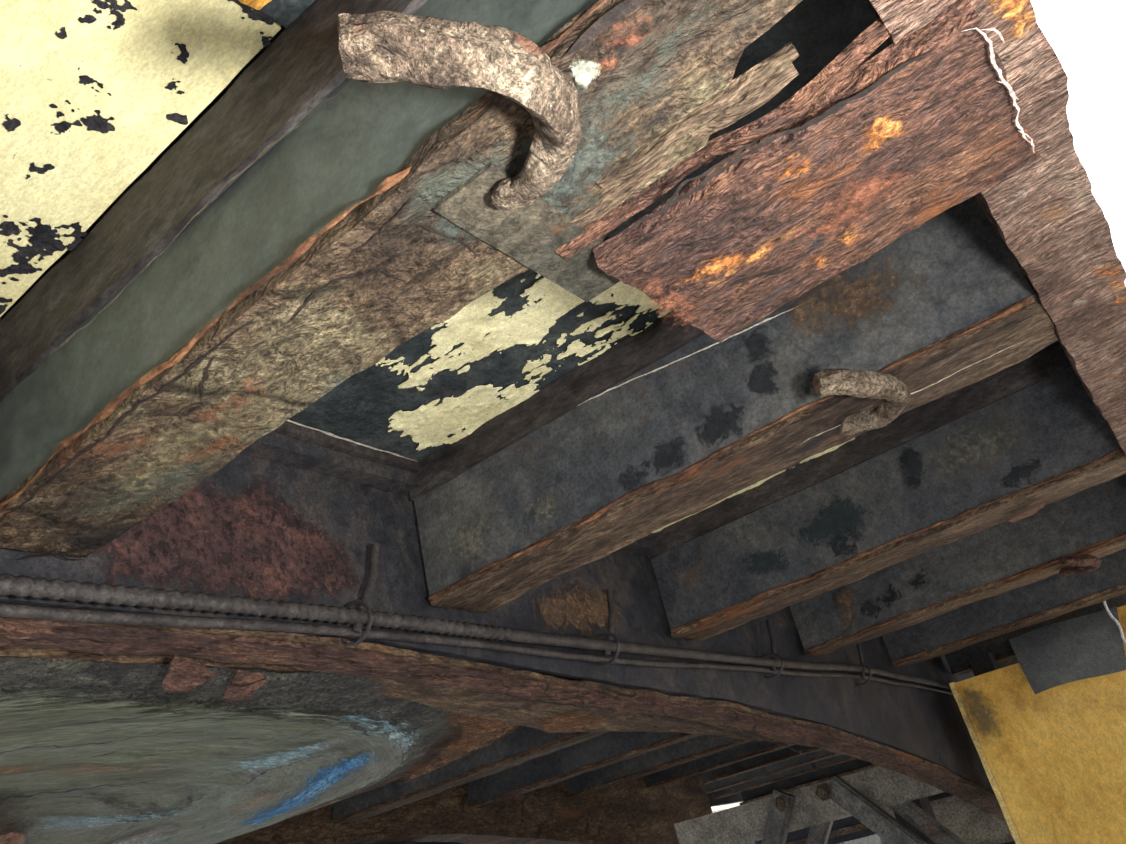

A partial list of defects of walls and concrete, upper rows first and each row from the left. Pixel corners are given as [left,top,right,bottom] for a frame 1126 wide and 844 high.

peeling [78,0,137,30]
corrosion [964,0,1036,152]
peeling [49,100,115,135]
corrosion [863,118,901,149]
peeling [0,215,88,321]
corrosion [687,245,770,281]
peeling [376,274,672,451]
leakage [744,328,780,394]
leakage [695,404,743,447]
leakage [618,437,685,491]
corrosion [97,483,360,601]
leakage [799,495,871,557]